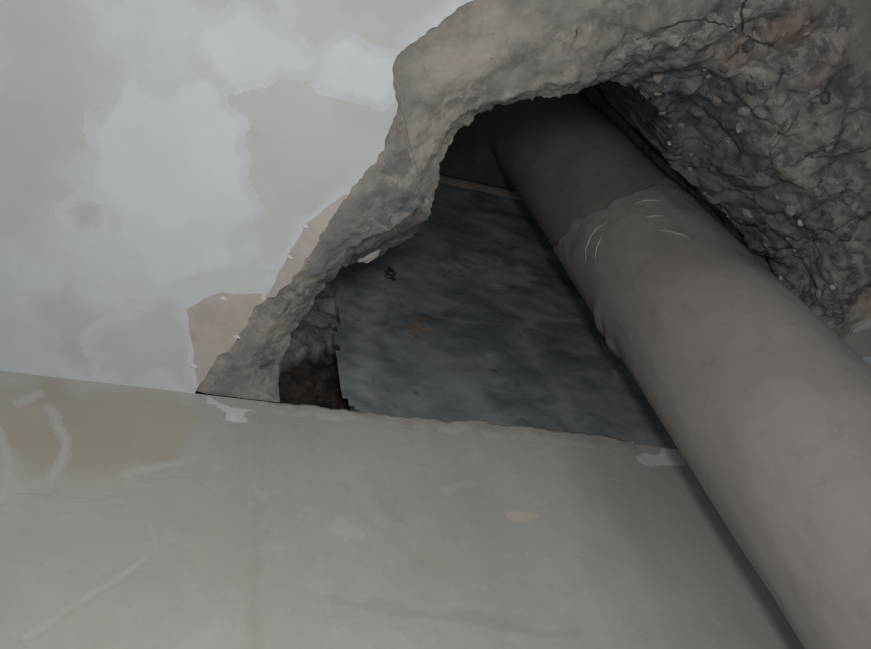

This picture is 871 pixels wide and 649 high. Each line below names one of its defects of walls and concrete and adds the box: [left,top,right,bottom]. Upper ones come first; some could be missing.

damp [168,0,473,52]
crack [636,0,771,45]
damp [0,0,197,394]
damp [228,78,398,272]
spalling [182,0,871,411]
damp [333,265,408,416]